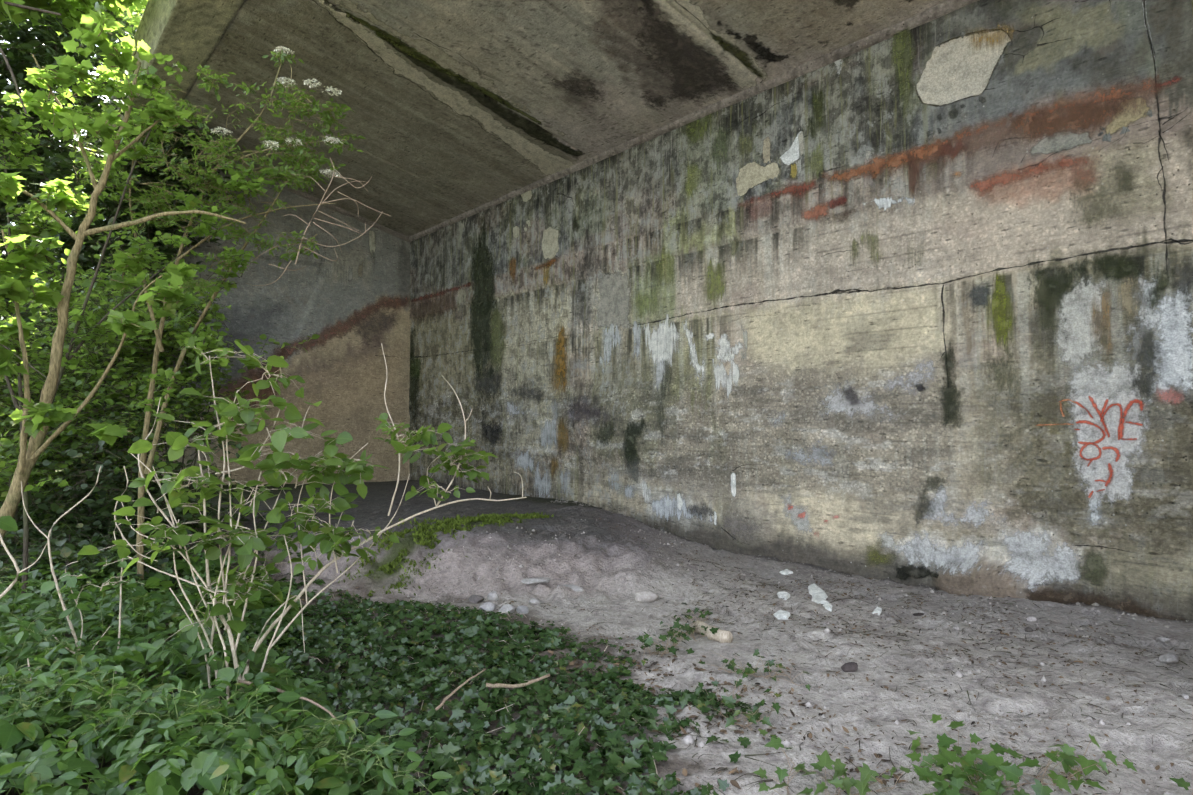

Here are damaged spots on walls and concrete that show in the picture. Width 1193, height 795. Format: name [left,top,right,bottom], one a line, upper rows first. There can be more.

peeling [312,0,574,176]
leakage [636,0,736,110]
leakage [717,21,789,67]
flaking render [915,29,1013,136]
flaking render [733,137,781,201]
corrosion [802,197,851,221]
crack [633,0,1193,378]
corrosion [738,77,1181,211]
leakage [600,250,747,398]
leakage [1034,251,1193,522]
leakage [881,533,983,580]
leakage [923,486,988,526]